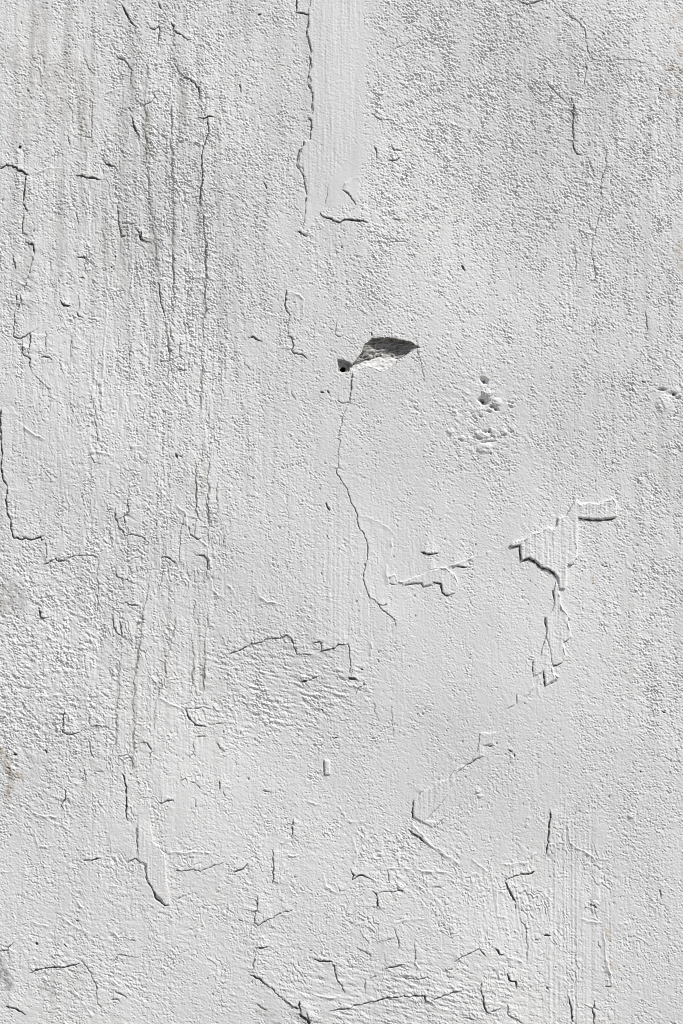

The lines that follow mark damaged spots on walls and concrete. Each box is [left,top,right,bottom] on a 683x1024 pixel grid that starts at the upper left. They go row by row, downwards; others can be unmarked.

crack [0,164,86,390]
crack [117,206,148,242]
crack [118,58,160,135]
crack [122,4,189,42]
crack [175,64,214,298]
spalling [350,337,419,373]
crack [0,411,138,611]
crack [230,635,394,731]
crack [336,375,396,626]
peeling [388,567,459,596]
peeling [510,498,617,686]
crack [251,800,607,1024]